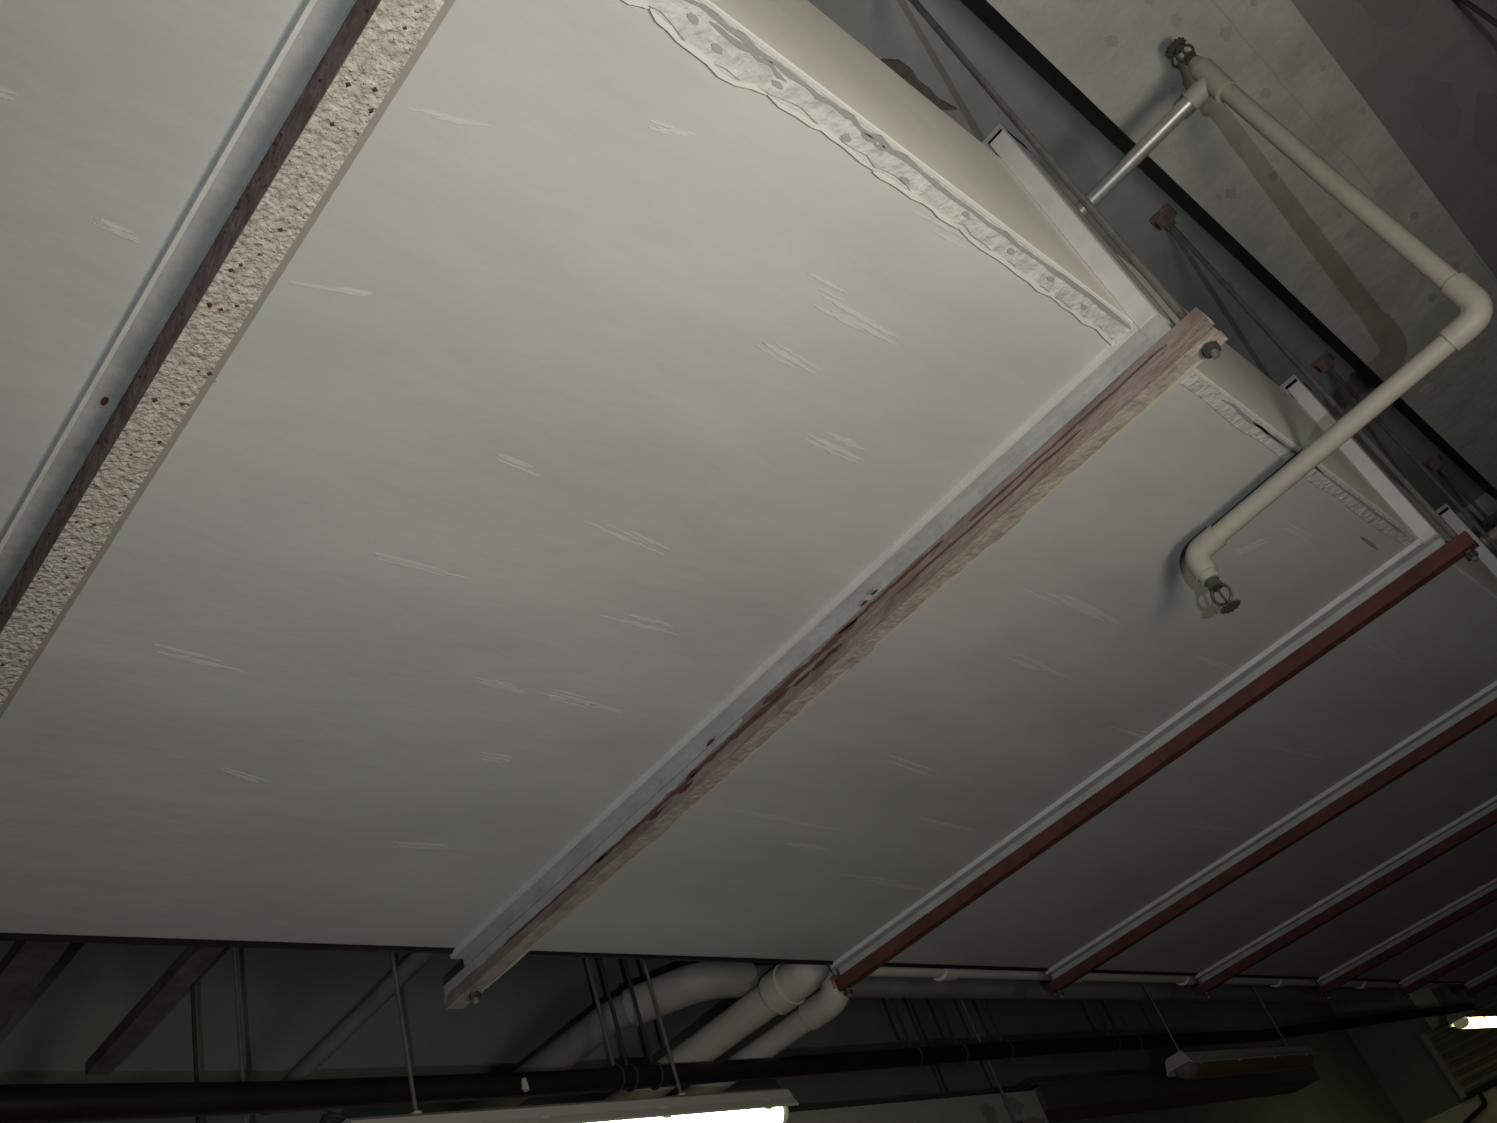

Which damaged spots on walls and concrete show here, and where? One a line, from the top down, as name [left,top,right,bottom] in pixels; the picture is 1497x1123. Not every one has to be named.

peeling [622,0,1115,346]
corrosion [503,344,1167,946]